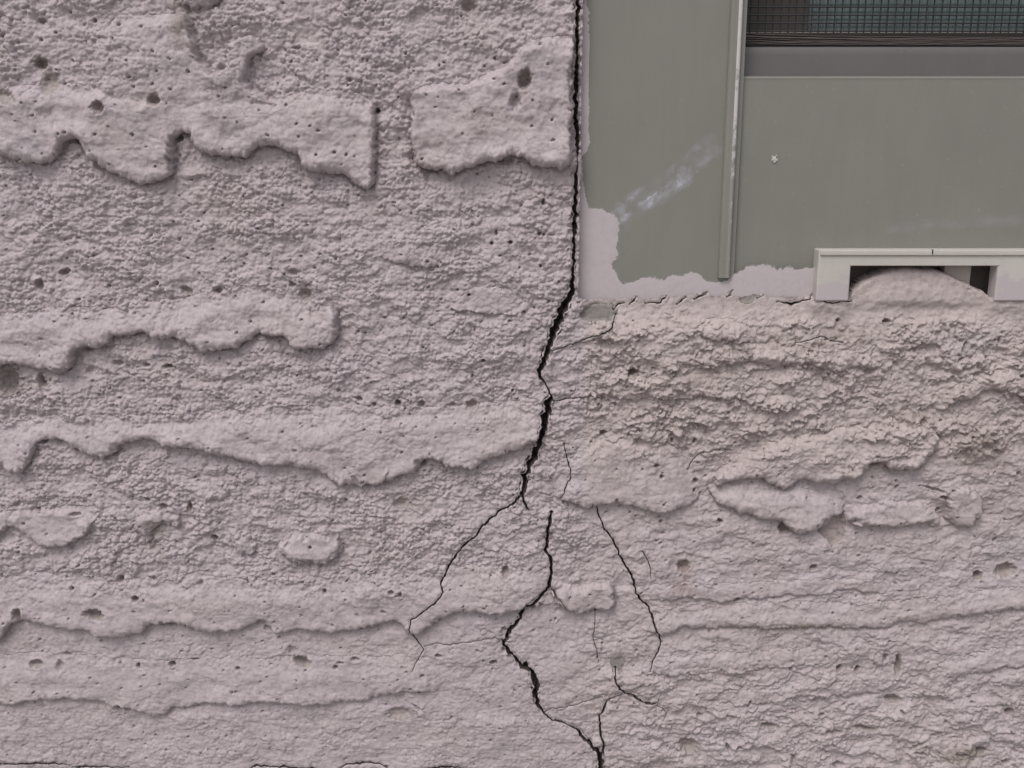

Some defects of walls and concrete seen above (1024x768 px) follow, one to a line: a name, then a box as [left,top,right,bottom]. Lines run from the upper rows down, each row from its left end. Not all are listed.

peeling [738,294,757,304]
crack [407,0,852,768]
crack [0,760,128,768]
crack [250,760,388,768]